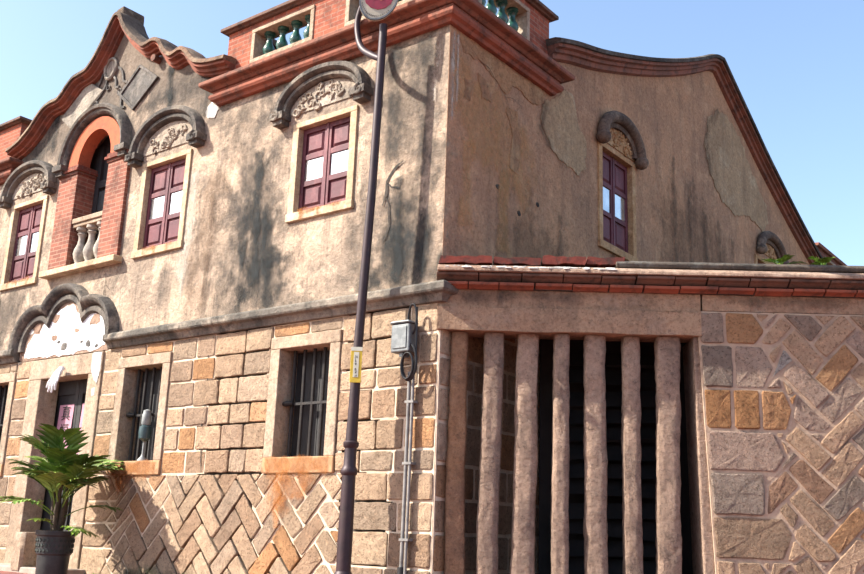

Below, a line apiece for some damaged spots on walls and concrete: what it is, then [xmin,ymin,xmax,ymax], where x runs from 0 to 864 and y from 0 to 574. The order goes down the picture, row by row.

spalling [458,34,587,176]
damp [235,150,287,309]
damp [368,178,431,288]
peeling [24,304,105,396]